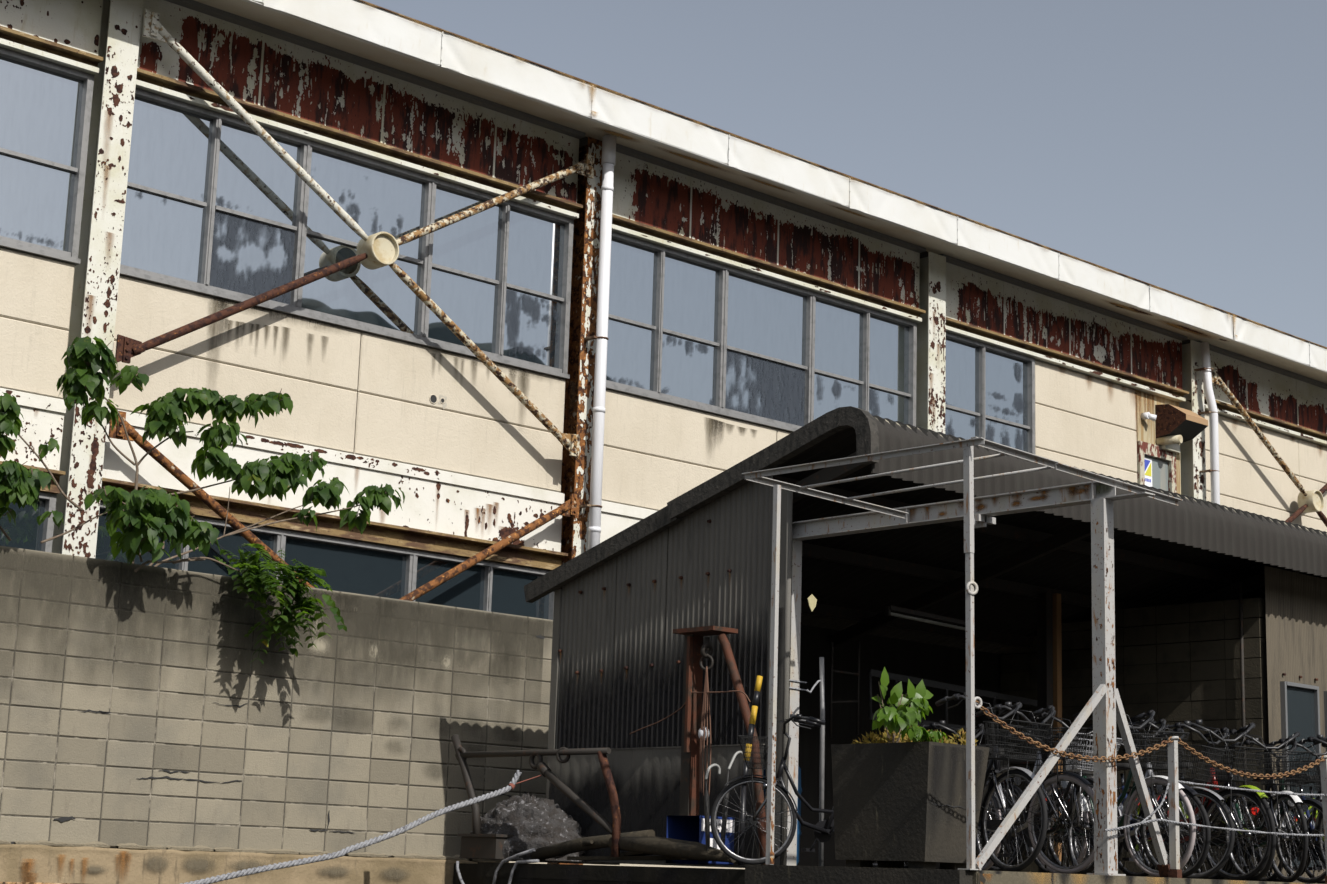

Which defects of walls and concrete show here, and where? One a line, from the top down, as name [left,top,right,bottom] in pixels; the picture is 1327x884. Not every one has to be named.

rust [83,8,577,351]
rust [0,398,106,558]
rust [246,435,554,551]
spalling [429,394,447,409]